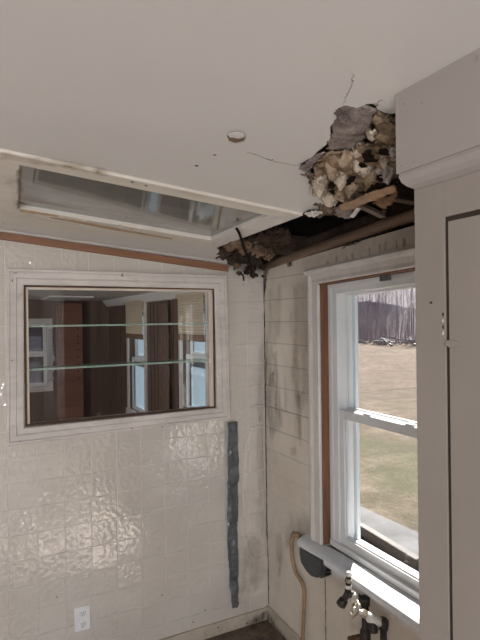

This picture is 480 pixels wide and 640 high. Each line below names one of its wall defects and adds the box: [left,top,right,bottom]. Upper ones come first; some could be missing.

spalling [304,206,338,218]